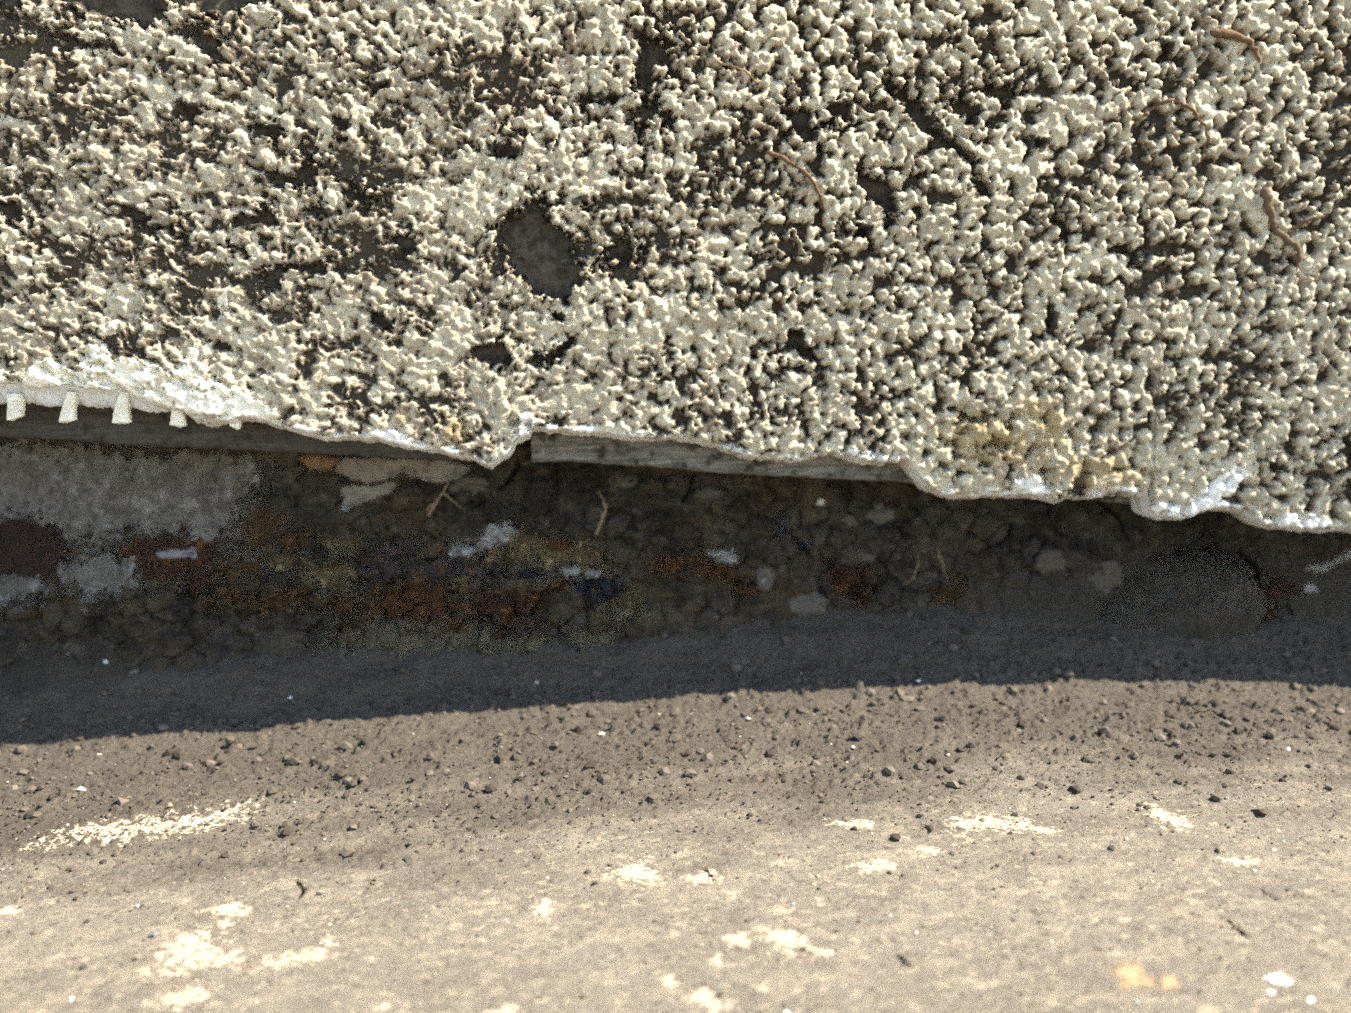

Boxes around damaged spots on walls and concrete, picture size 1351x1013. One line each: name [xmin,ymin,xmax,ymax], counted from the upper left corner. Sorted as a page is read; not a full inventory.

flaking render [393,235,419,260]
flaking render [217,287,229,316]
flaking render [369,312,402,334]
flaking render [0,320,319,435]
flaking render [365,429,462,456]